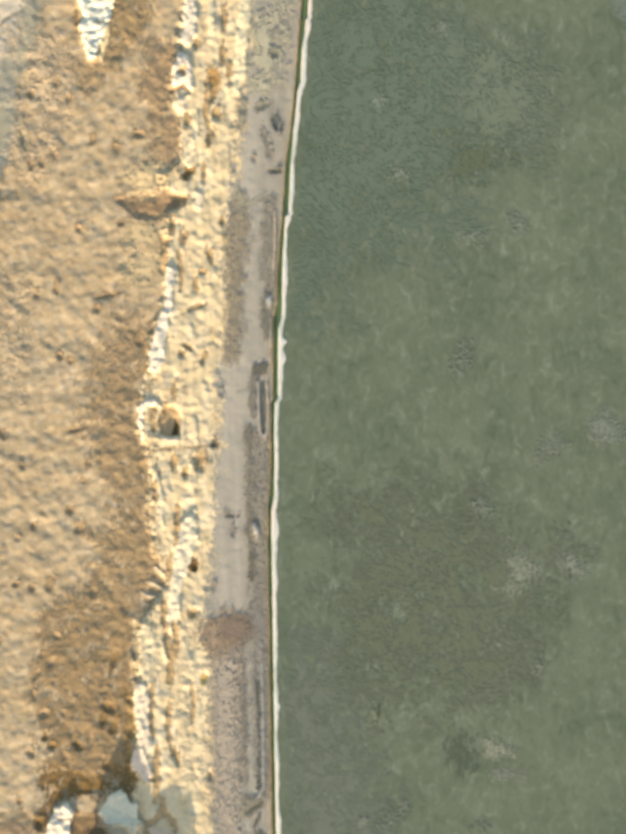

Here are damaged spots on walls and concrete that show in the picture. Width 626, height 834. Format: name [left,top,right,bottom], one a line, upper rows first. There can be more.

peeling [91,0,251,374]
spalling [63,503,89,538]
spalling [12,574,57,593]
peeling [125,379,223,808]
spalling [96,685,122,736]
peeling [33,803,74,834]
peeling [98,790,178,834]